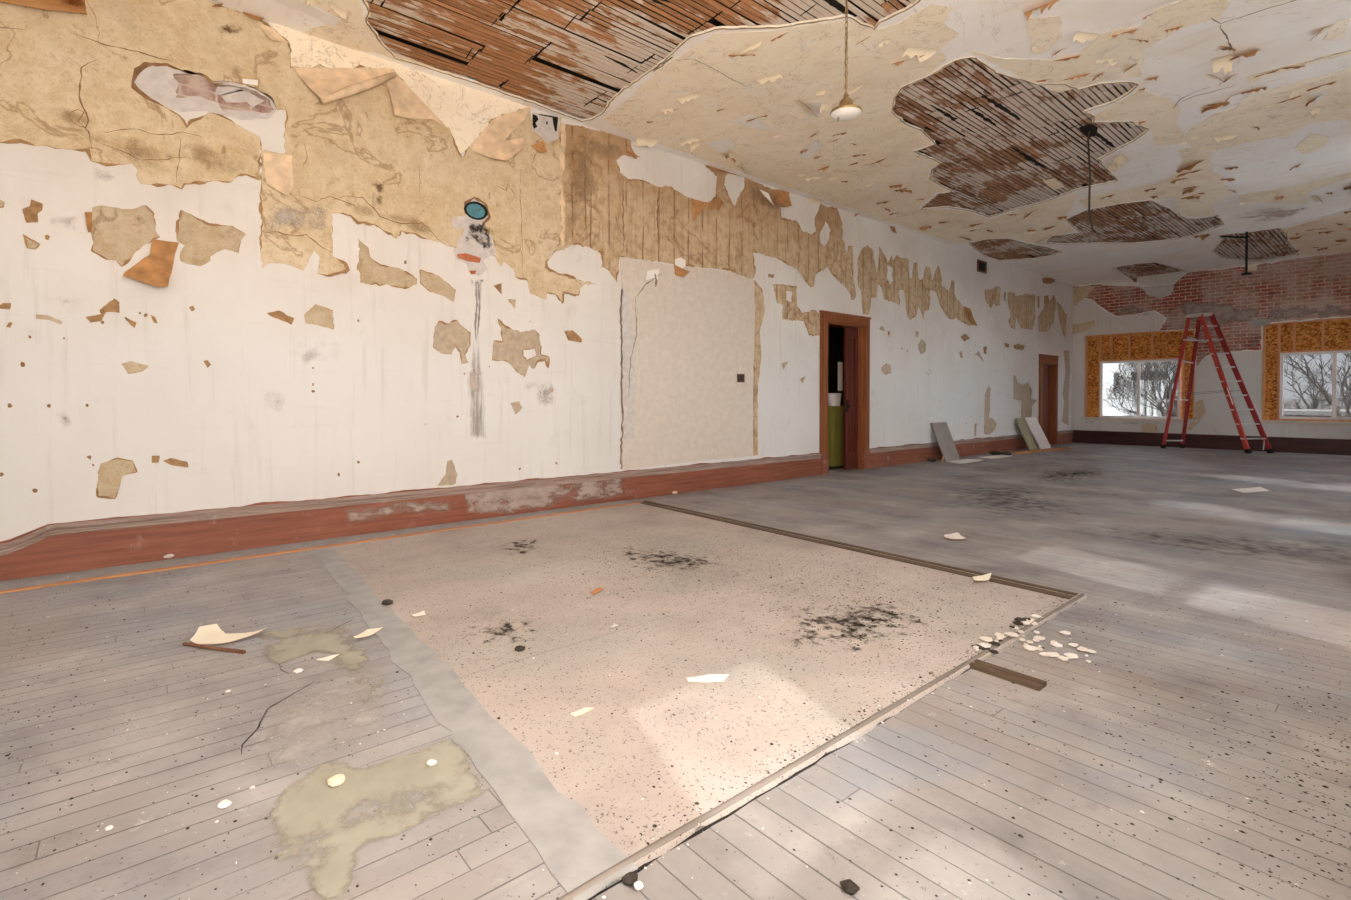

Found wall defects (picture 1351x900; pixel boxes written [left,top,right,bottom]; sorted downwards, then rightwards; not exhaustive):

peeling [0,0,86,14]
flaking render [131,62,276,120]
peeling [22,199,50,250]
peeling [85,205,246,287]
peeling [243,0,1351,425]
damp [472,369,482,435]
peeling [349,503,448,520]
peeling [437,460,622,512]
damp [263,628,384,725]
damp [271,740,484,898]